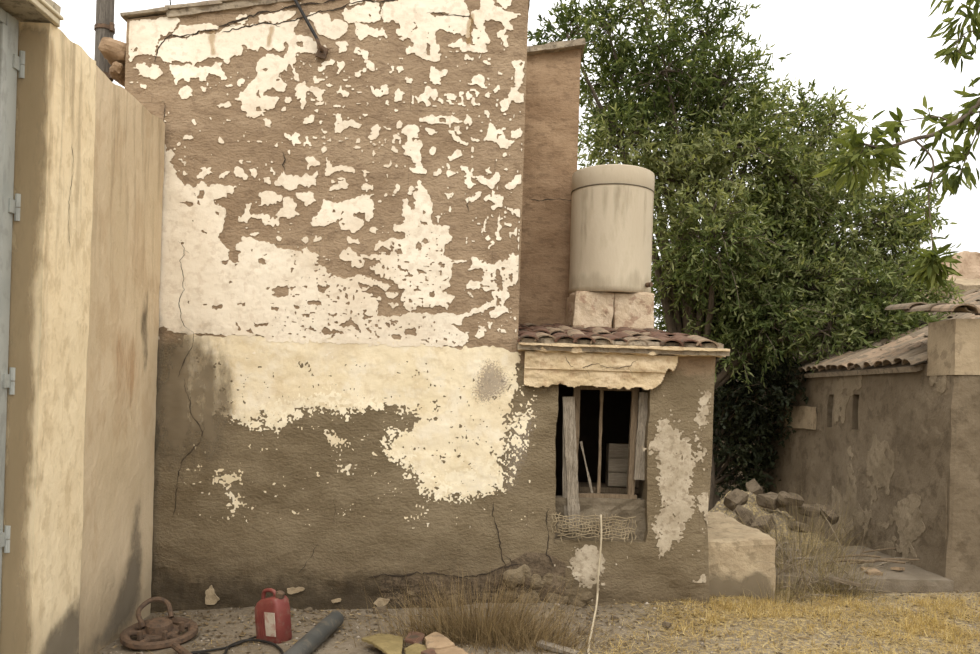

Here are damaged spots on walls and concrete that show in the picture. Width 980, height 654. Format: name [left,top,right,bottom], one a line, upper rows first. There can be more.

crack [155,0,395,59]
peeling [128,0,537,529]
crack [173,245,204,514]
leakage [154,335,537,504]
crack [368,502,522,583]
spalling [374,545,628,608]
crack [545,508,557,565]
peeling [642,390,711,559]